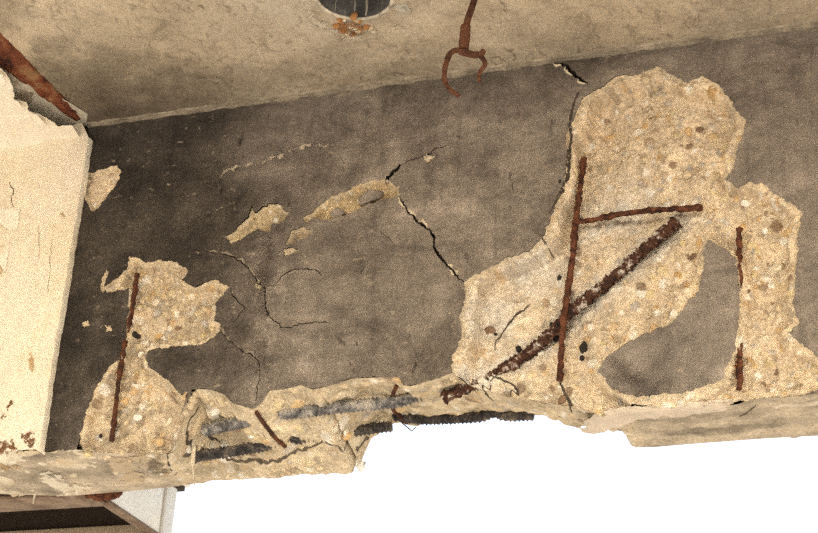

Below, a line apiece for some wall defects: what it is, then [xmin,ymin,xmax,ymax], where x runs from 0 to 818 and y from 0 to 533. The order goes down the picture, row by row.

corrosion [331,12,376,36]
corrosion [0,33,80,121]
spalling [85,166,121,211]
spalling [226,204,289,244]
spalling [283,179,400,255]
crack [385,145,464,282]
spalling [451,67,818,416]
crack [208,250,331,328]
spalling [80,256,229,475]
crack [220,291,261,401]